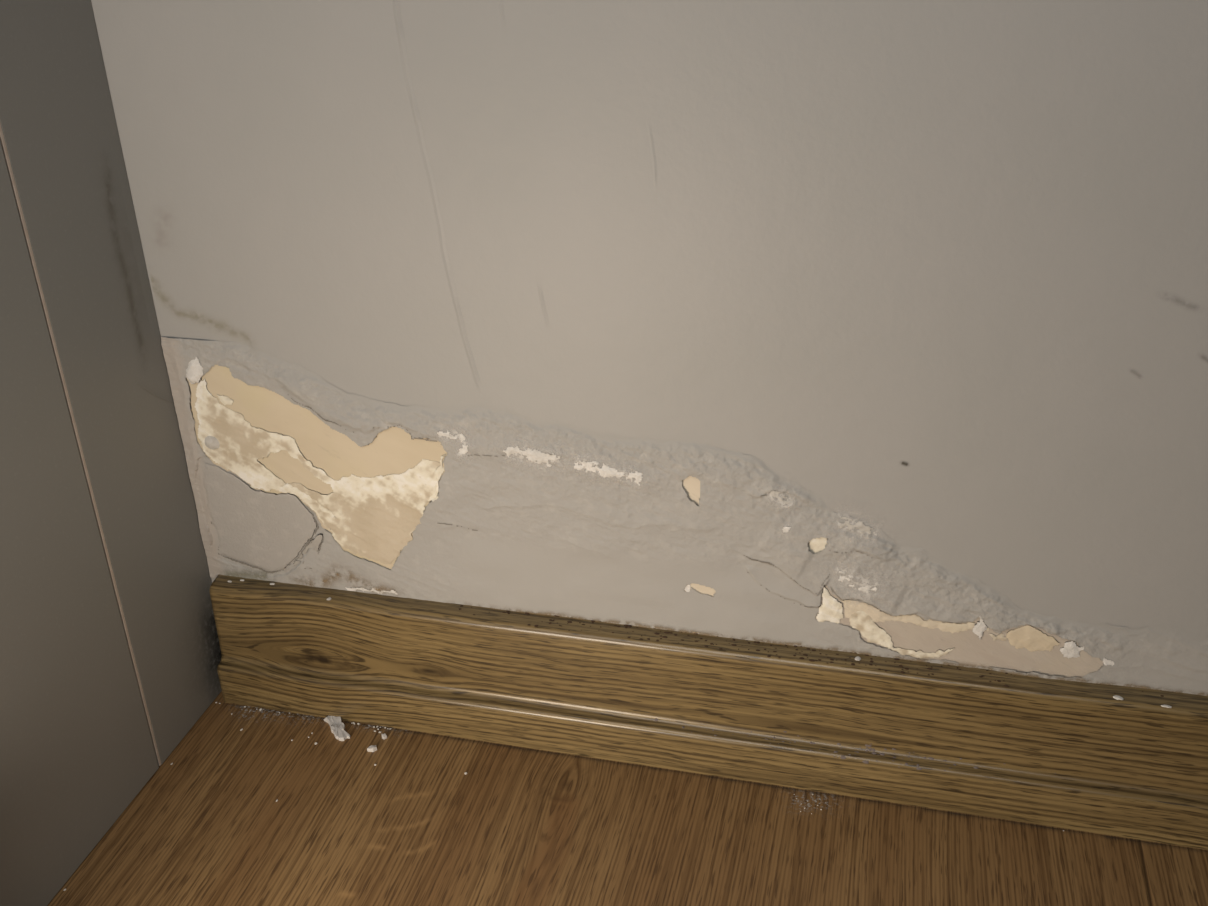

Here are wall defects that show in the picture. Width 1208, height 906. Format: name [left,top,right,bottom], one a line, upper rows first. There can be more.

peeling [186,357,447,572]
peeling [682,476,700,506]
crack [744,550,872,608]
flaking render [815,585,1115,678]